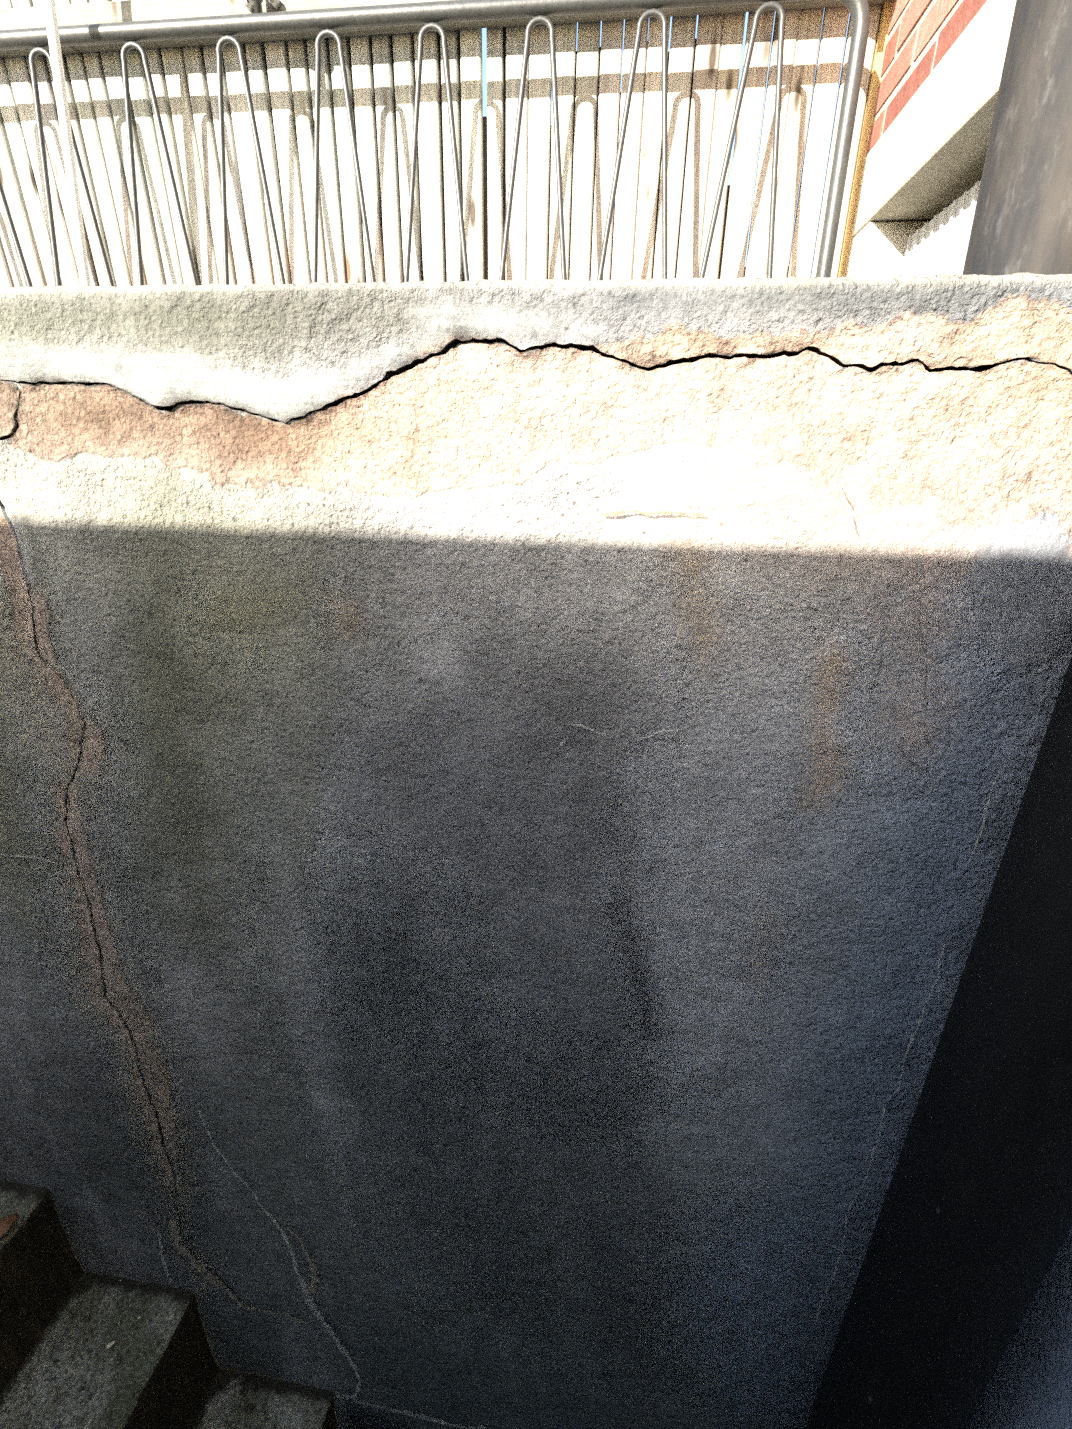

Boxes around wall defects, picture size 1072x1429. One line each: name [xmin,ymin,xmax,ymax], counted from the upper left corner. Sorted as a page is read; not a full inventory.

crack [0,338,1072,440]
spalling [0,293,1072,557]
crack [601,508,705,516]
spalling [0,506,178,1217]
crack [0,501,487,1429]
crack [814,599,929,771]
crack [970,774,999,858]
crack [816,943,945,1321]